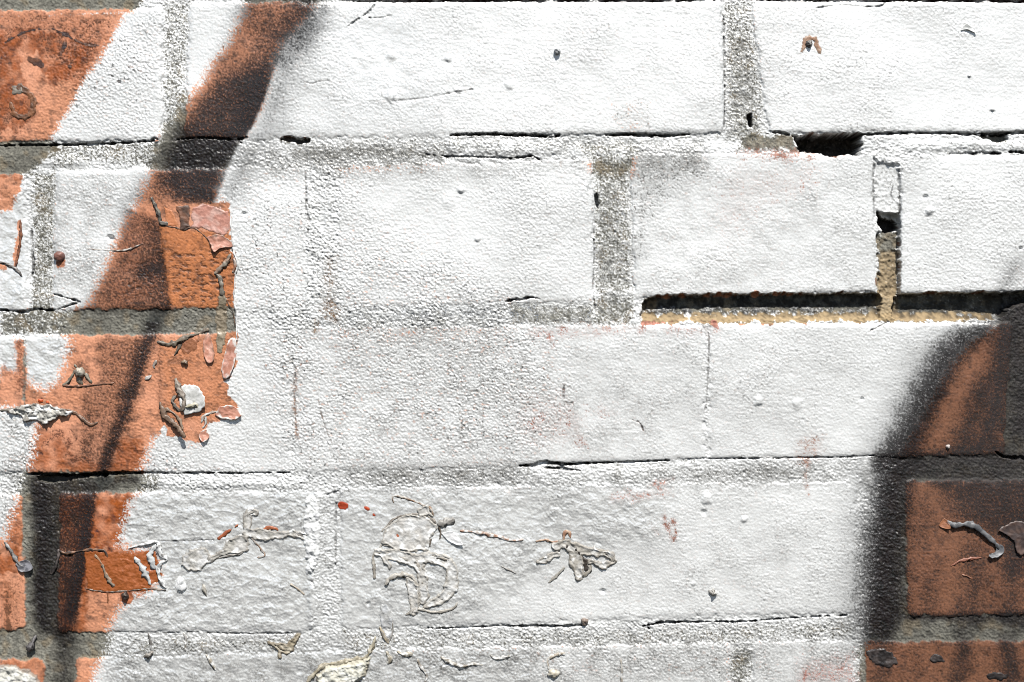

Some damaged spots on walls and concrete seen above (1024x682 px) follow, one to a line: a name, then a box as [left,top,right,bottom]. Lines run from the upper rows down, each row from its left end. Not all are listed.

spalling [27,56,44,68]
peeling [9,83,37,121]
peeling [145,197,241,443]
peeling [4,541,33,572]
peeling [50,540,168,603]
peeling [939,518,1024,579]